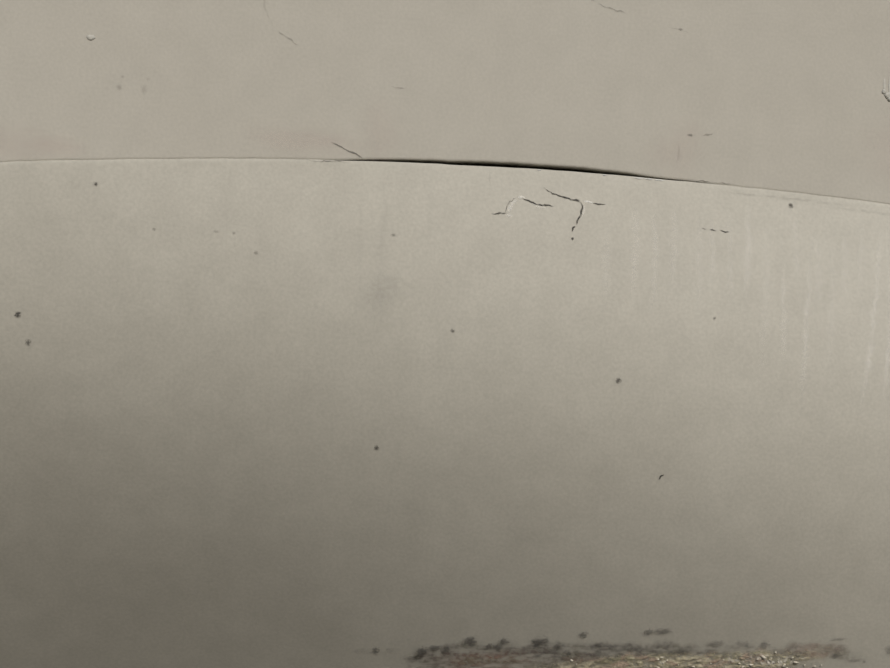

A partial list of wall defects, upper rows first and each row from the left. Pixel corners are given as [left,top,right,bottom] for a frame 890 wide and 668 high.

crack [410,162,664,240]
spalling [419,638,822,668]